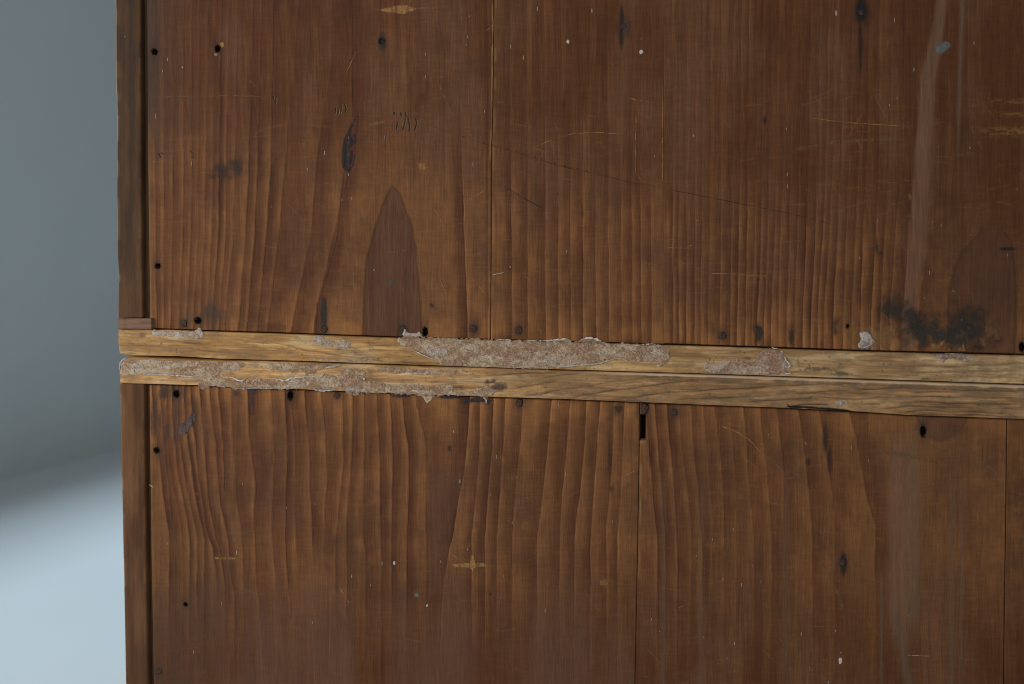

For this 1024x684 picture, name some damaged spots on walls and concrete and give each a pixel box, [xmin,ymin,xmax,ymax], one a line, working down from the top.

damp [882,301,982,349]
peeling [119,338,469,394]
peeling [495,337,664,367]